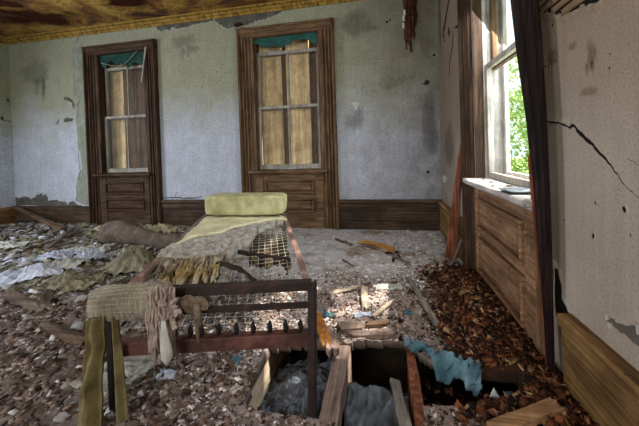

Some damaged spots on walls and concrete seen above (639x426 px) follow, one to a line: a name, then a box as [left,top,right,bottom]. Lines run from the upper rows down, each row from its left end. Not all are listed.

flaking render [155,9,295,33]
flaking render [15,35,89,206]
crack [547,112,639,198]
flaking render [604,311,639,351]